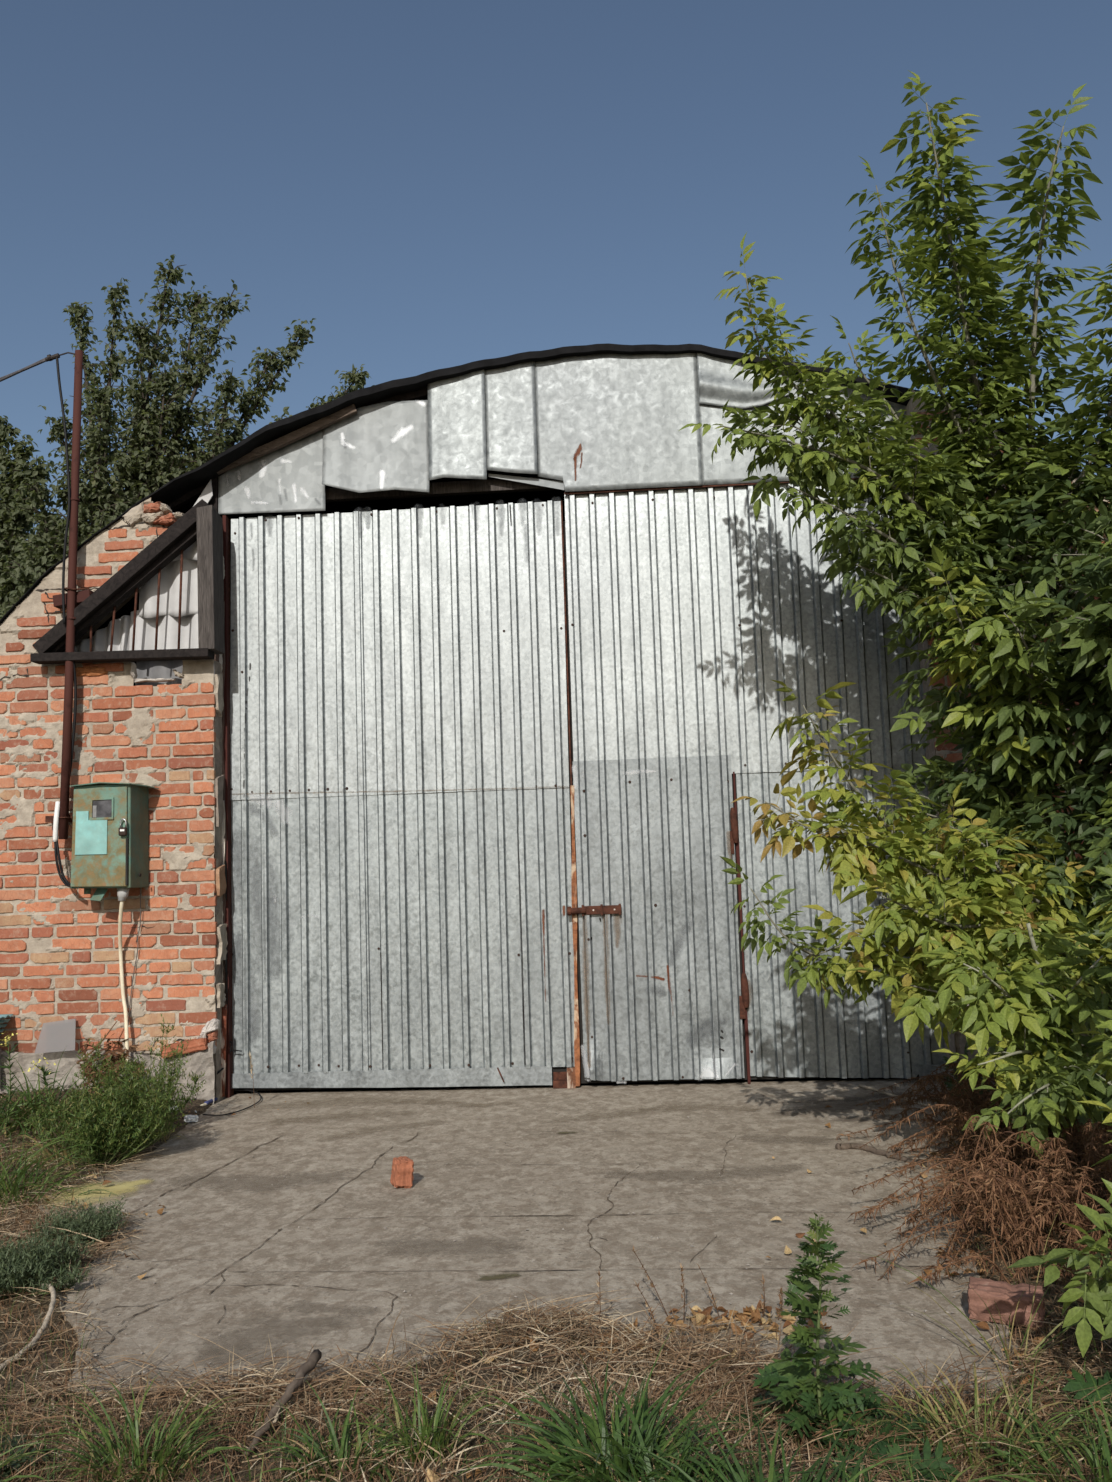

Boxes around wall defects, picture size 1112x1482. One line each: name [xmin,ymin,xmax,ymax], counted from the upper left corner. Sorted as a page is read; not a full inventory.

corrosion [573,444,583,481]
spalling [76,663,108,677]
spalling [214,654,224,717]
spalling [197,775,228,1054]
crack [60,1130,784,1375]